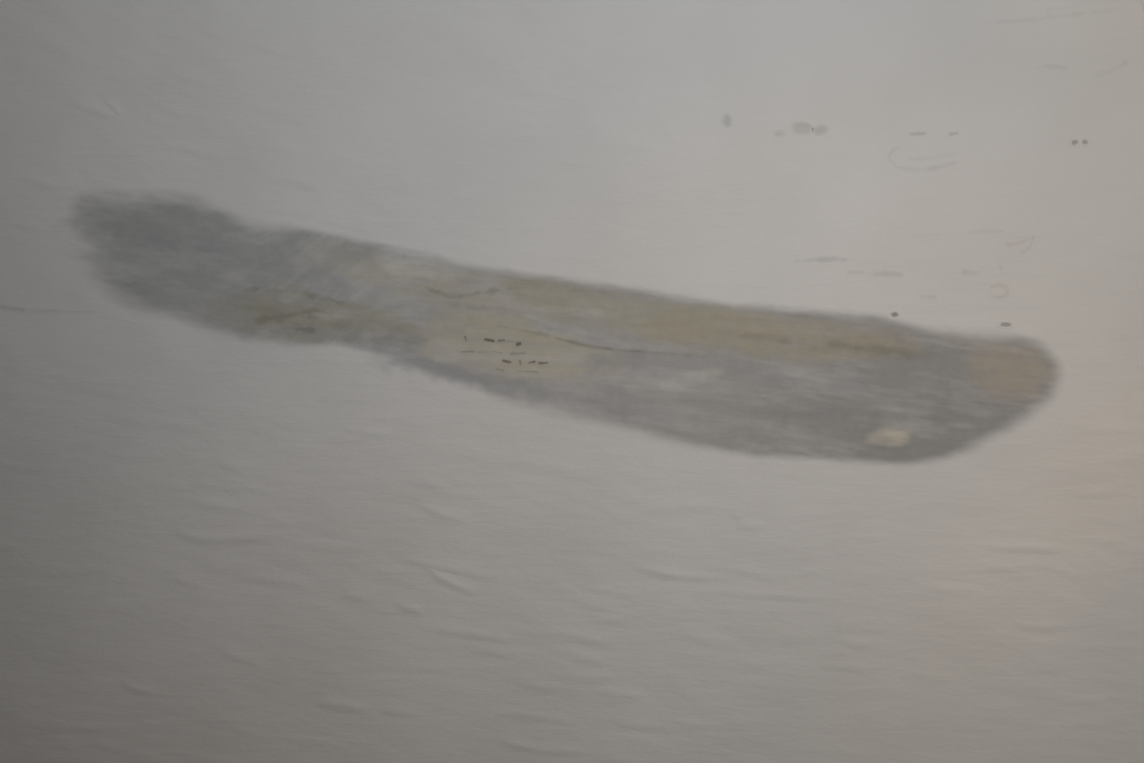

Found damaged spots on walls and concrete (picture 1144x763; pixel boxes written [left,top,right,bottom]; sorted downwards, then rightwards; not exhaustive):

water stain [51,185,1067,469]